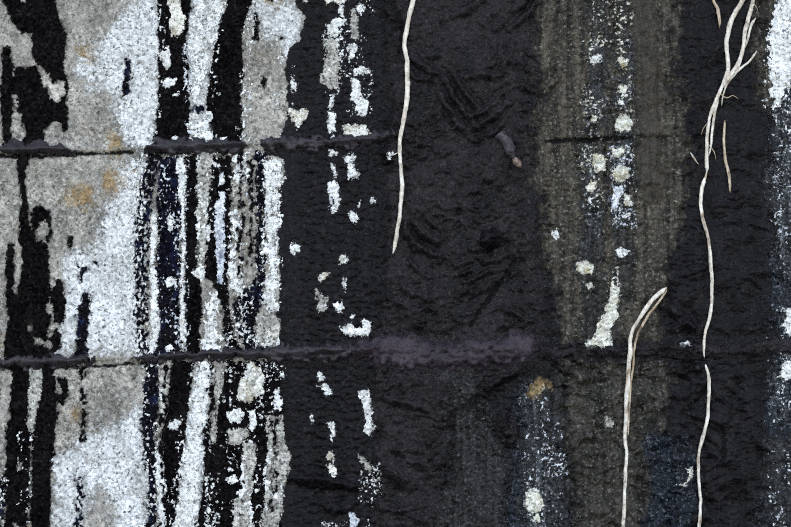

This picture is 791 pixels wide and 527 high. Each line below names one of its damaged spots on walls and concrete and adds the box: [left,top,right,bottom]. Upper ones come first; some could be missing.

peeling [320,0,373,137]
peeling [762,0,791,244]
peeling [327,149,360,214]
peeling [348,197,376,225]
peeling [781,308,791,339]
peeling [776,353,791,409]